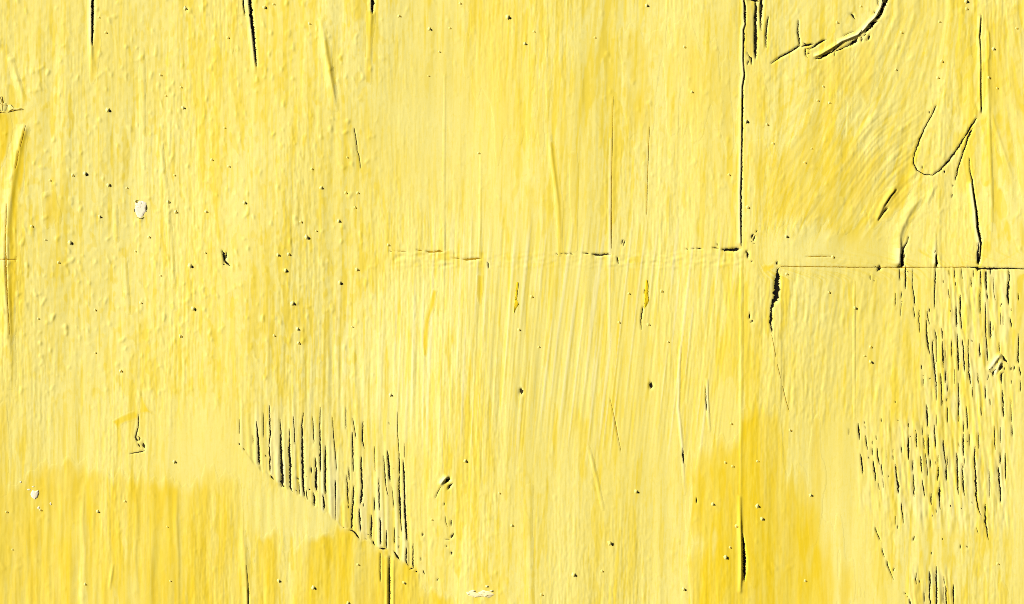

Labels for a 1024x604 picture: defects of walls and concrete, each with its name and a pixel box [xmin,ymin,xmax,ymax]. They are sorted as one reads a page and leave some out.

crack [242,0,258,74]
crack [693,0,825,251]
crack [769,159,1024,604]
crack [239,405,423,604]
crack [740,537,748,580]